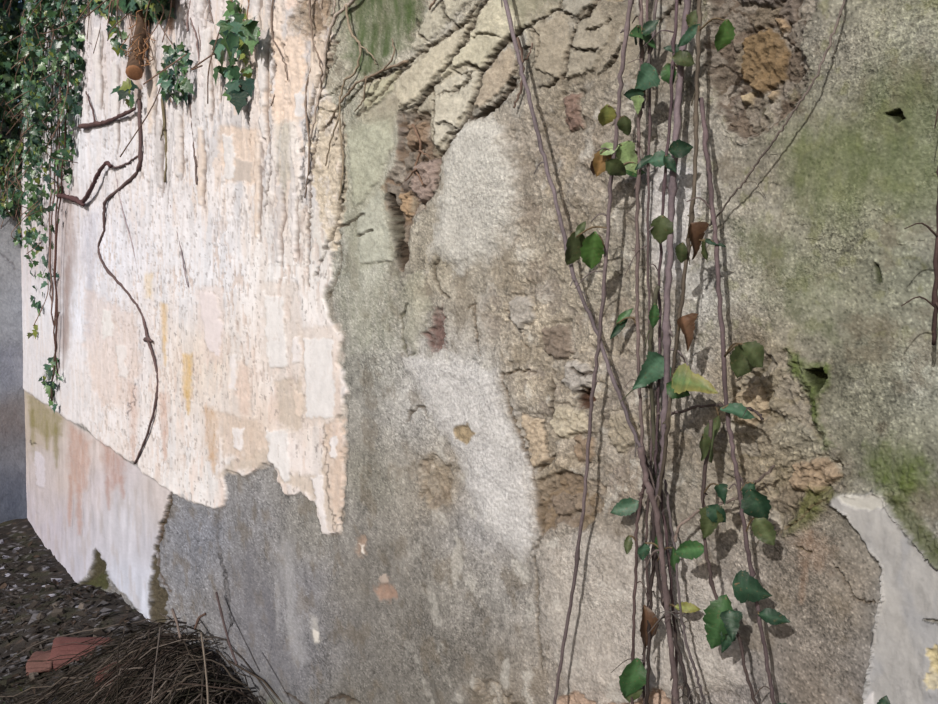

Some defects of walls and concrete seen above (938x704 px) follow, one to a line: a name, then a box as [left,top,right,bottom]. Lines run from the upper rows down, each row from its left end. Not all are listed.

crack [299,0,621,303]
crack [656,0,684,23]
spalling [701,0,819,145]
spalling [887,109,906,123]
spalling [80,0,672,545]
spalling [660,273,938,704]
spalling [471,675,529,704]
spalling [556,688,671,704]